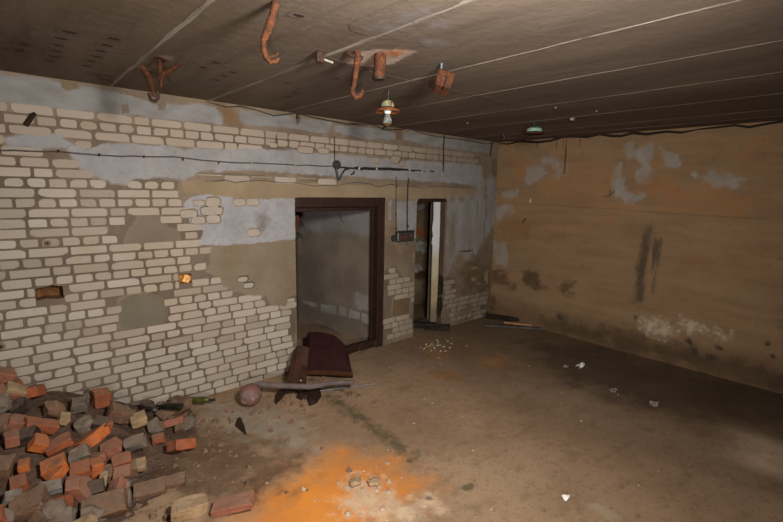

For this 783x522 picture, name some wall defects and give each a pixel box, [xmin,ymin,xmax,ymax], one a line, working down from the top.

peeling [0,70,572,274]
spalling [36,285,64,300]
spalling [179,273,192,284]
flaking render [183,194,296,306]
leakage [455,214,783,425]